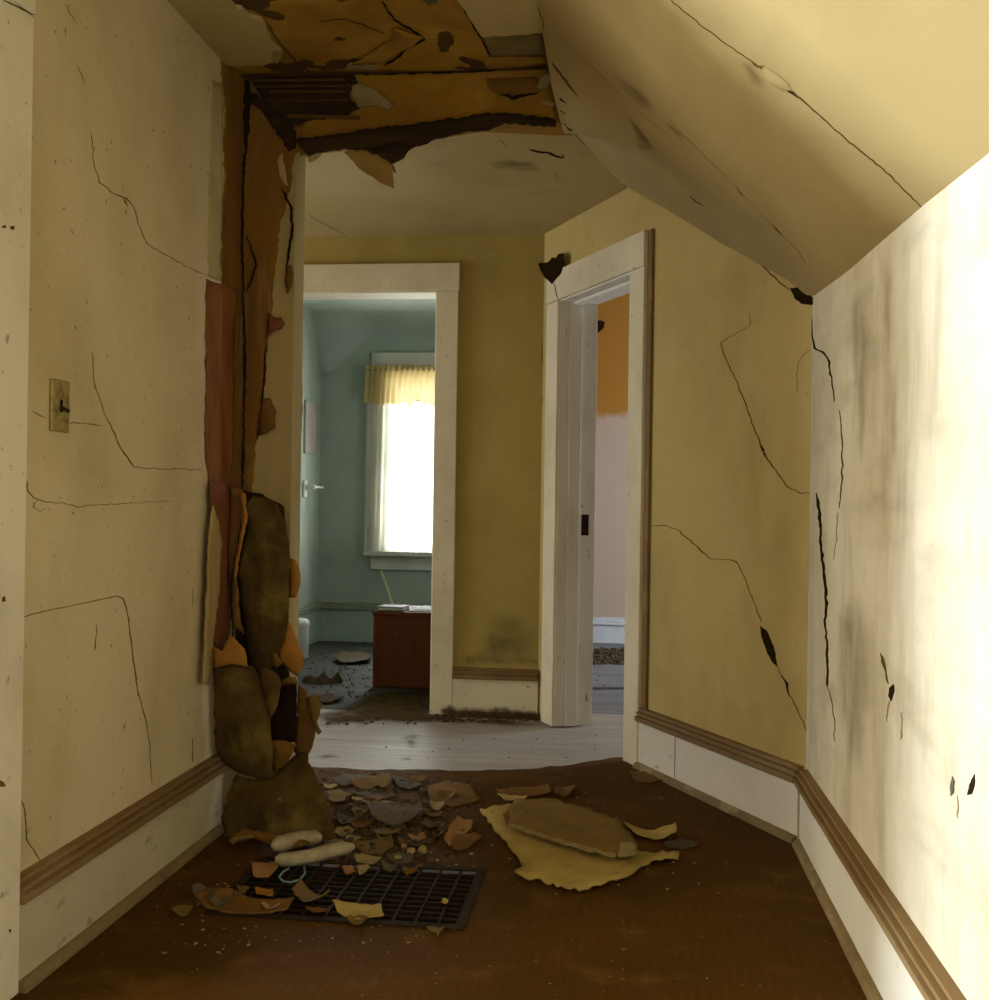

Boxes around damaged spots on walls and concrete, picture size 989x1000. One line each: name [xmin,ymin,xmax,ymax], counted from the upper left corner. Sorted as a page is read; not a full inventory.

crack [91,133,220,280]
spalling [234,0,548,186]
crack [671,0,765,70]
crack [787,90,922,208]
peeling [266,313,285,339]
peeling [285,264,294,294]
crack [69,354,201,471]
peeling [258,398,276,436]
crack [650,525,761,621]
crack [721,317,844,742]
crack [24,596,152,783]
hole [269,684,298,742]